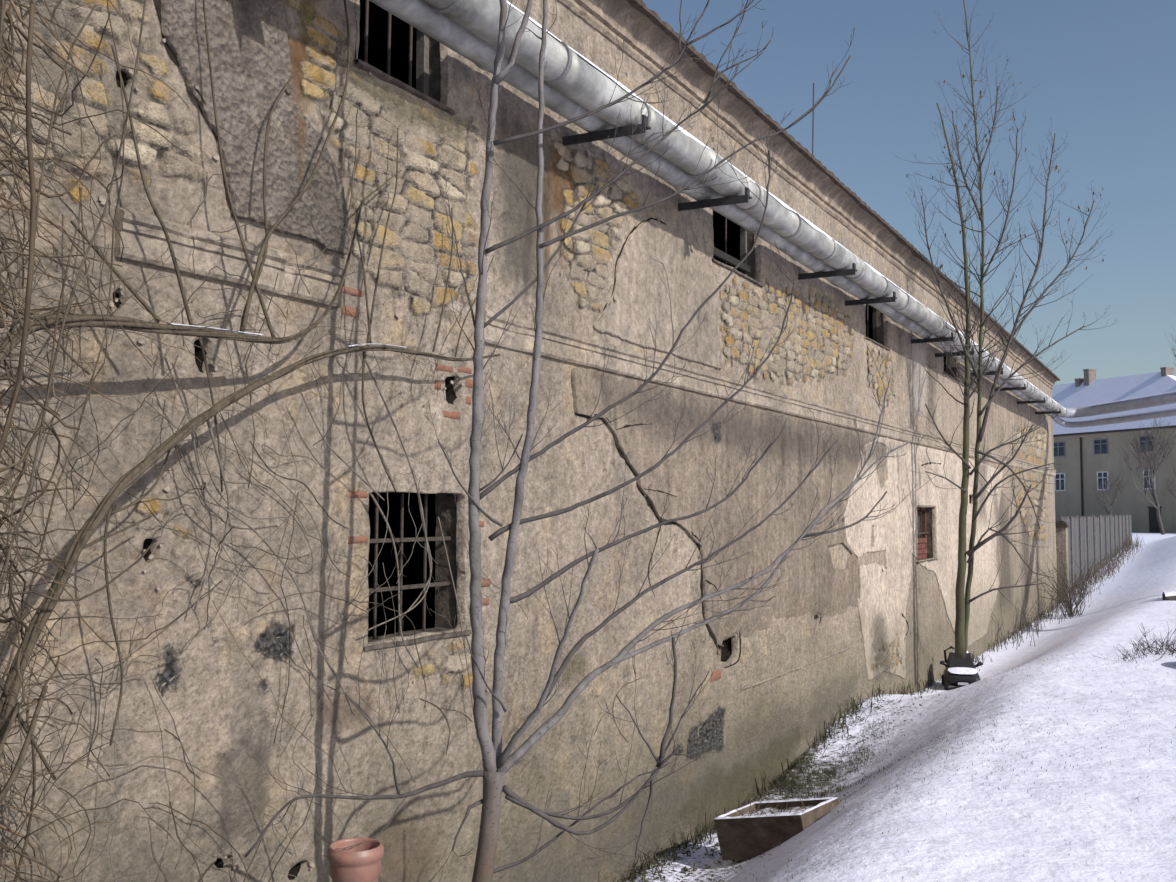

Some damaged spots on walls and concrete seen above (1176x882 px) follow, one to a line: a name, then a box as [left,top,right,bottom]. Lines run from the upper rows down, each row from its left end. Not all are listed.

crack [154,0,233,217]
flaking render [0,0,481,327]
flaking render [549,132,896,406]
flaking render [434,363,473,419]
crack [575,414,722,648]
spalling [675,707,726,761]